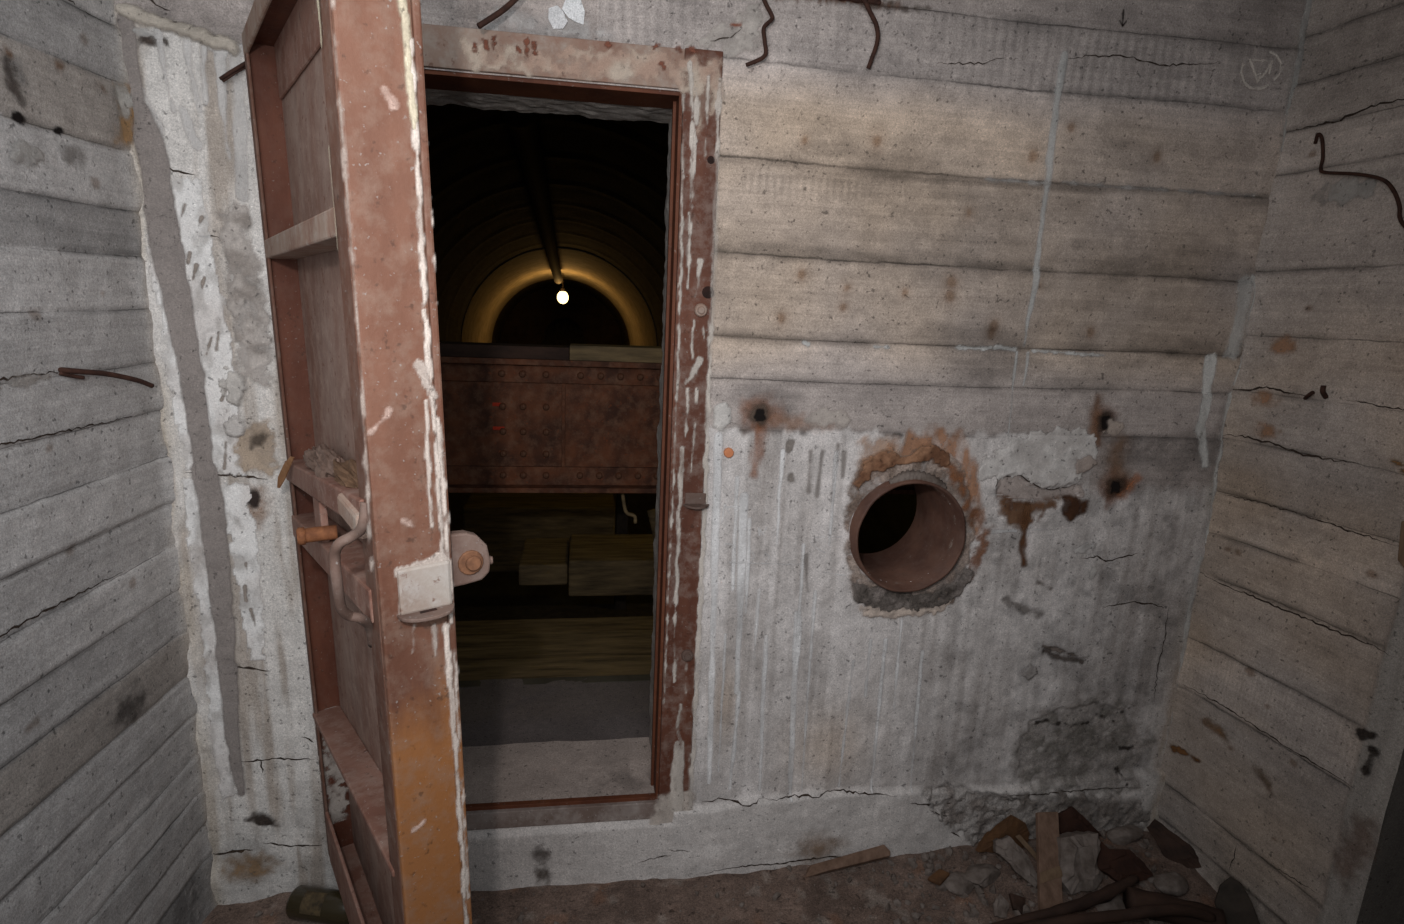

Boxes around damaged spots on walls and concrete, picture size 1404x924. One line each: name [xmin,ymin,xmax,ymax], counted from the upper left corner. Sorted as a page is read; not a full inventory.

rust [472,36,497,52]
rust [516,37,537,56]
rust [653,43,697,69]
crack [1296,99,1404,130]
crack [0,414,141,445]
rust [749,404,768,425]
rust [1091,398,1135,496]
spalling [844,426,1098,619]
crack [0,570,125,637]
crack [1011,787,1145,796]
crack [702,789,962,836]